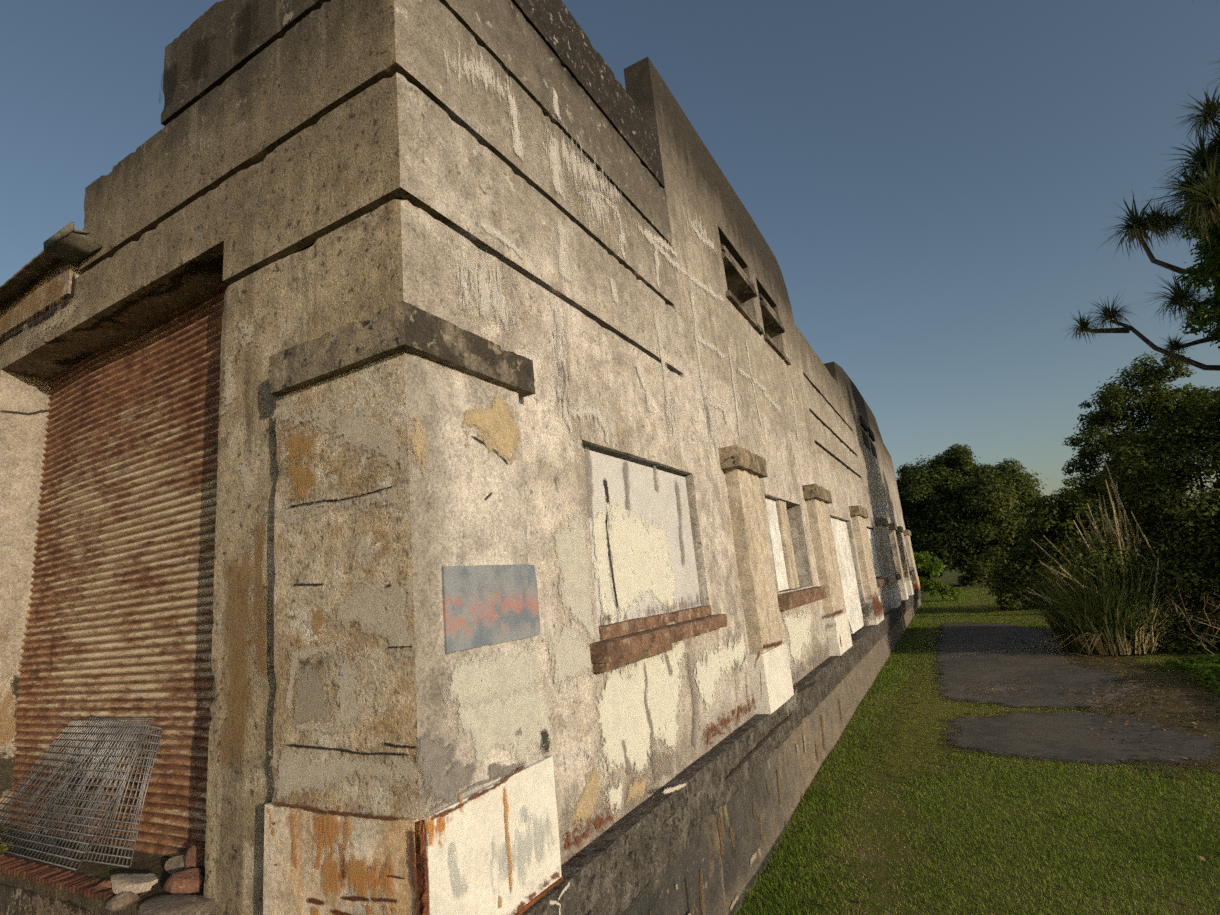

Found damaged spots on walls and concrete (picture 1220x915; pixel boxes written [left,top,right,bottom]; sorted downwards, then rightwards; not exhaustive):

peeling [219,314,256,417]
peeling [271,393,427,531]
spalling [462,395,521,464]
peeling [268,500,746,827]
corrosion [704,640,782,745]
corrosion [267,767,564,915]
corrosion [562,804,618,858]